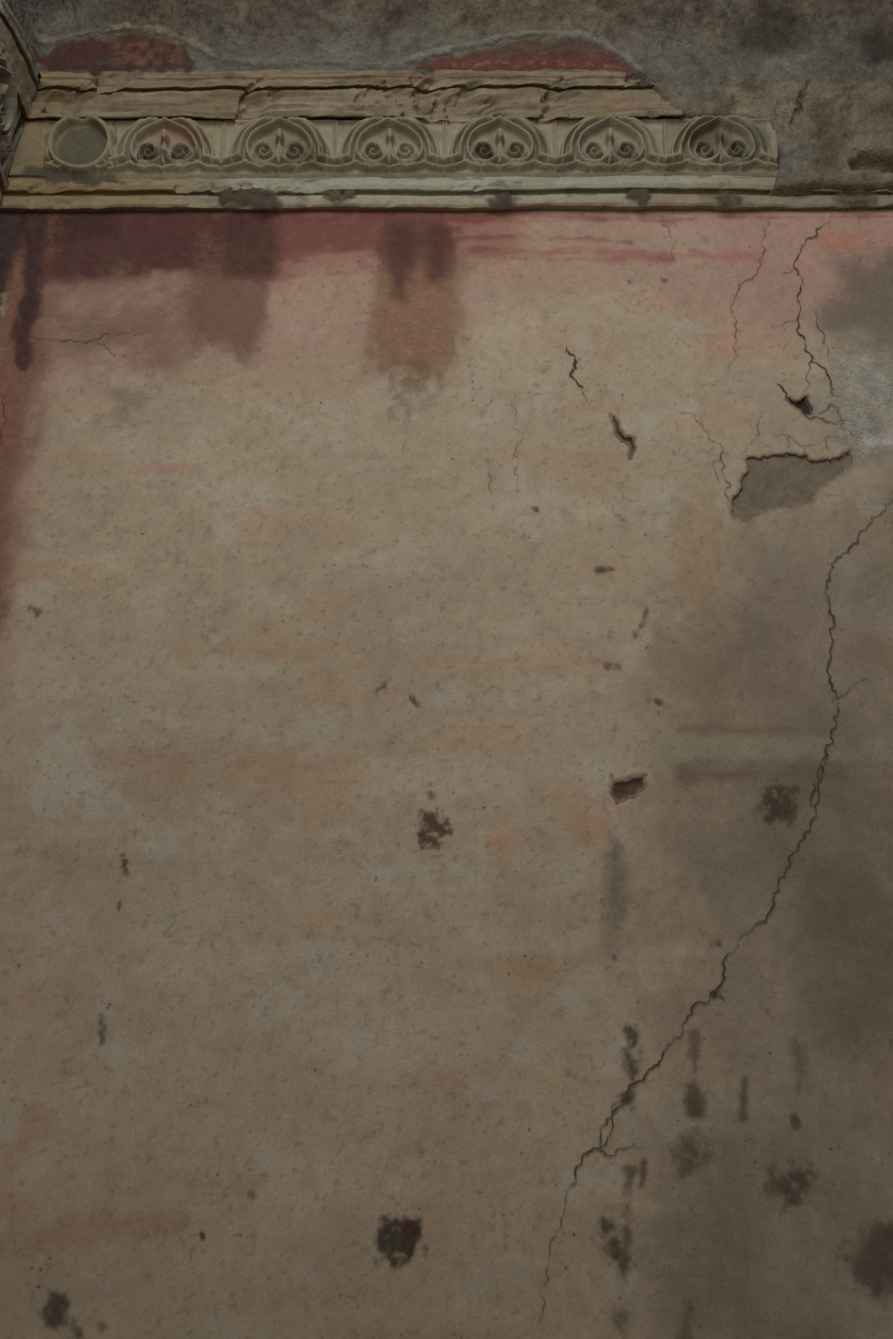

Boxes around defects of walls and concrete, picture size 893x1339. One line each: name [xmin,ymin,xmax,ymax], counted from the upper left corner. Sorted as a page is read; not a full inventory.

damp [0,210,444,362]
crack [566,346,588,401]
crack [683,210,865,503]
flaking render [730,345,893,524]
flaking render [417,810,452,849]
crack [542,499,893,1311]
flaking render [763,785,797,823]
flaking render [378,1216,422,1267]